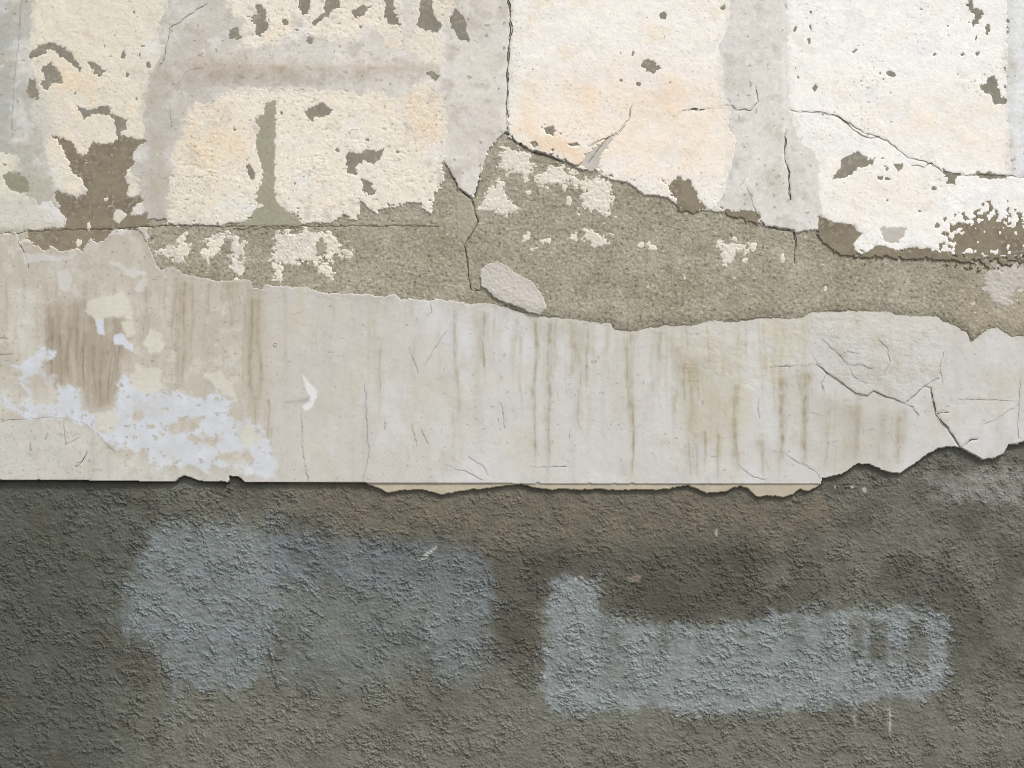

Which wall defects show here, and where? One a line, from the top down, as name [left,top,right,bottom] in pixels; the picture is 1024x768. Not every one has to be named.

crack [785,110,1016,200]
water stain [443,301,494,481]
spalling [0,92,1024,570]
water stain [522,313,1024,518]
crack [780,344,1021,448]